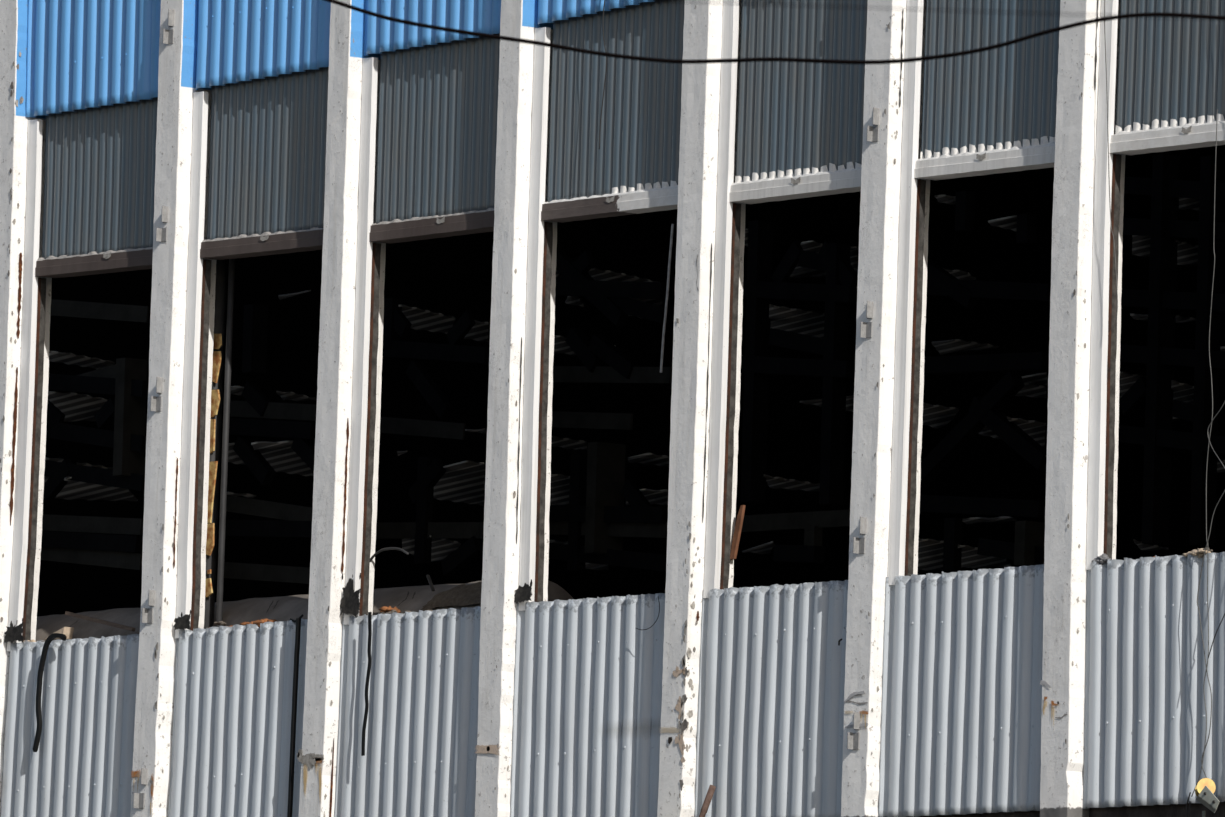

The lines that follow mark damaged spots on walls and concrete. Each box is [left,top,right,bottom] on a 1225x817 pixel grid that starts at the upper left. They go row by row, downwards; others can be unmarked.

spalling [672,522,701,763]
corrosion [303,742,334,817]